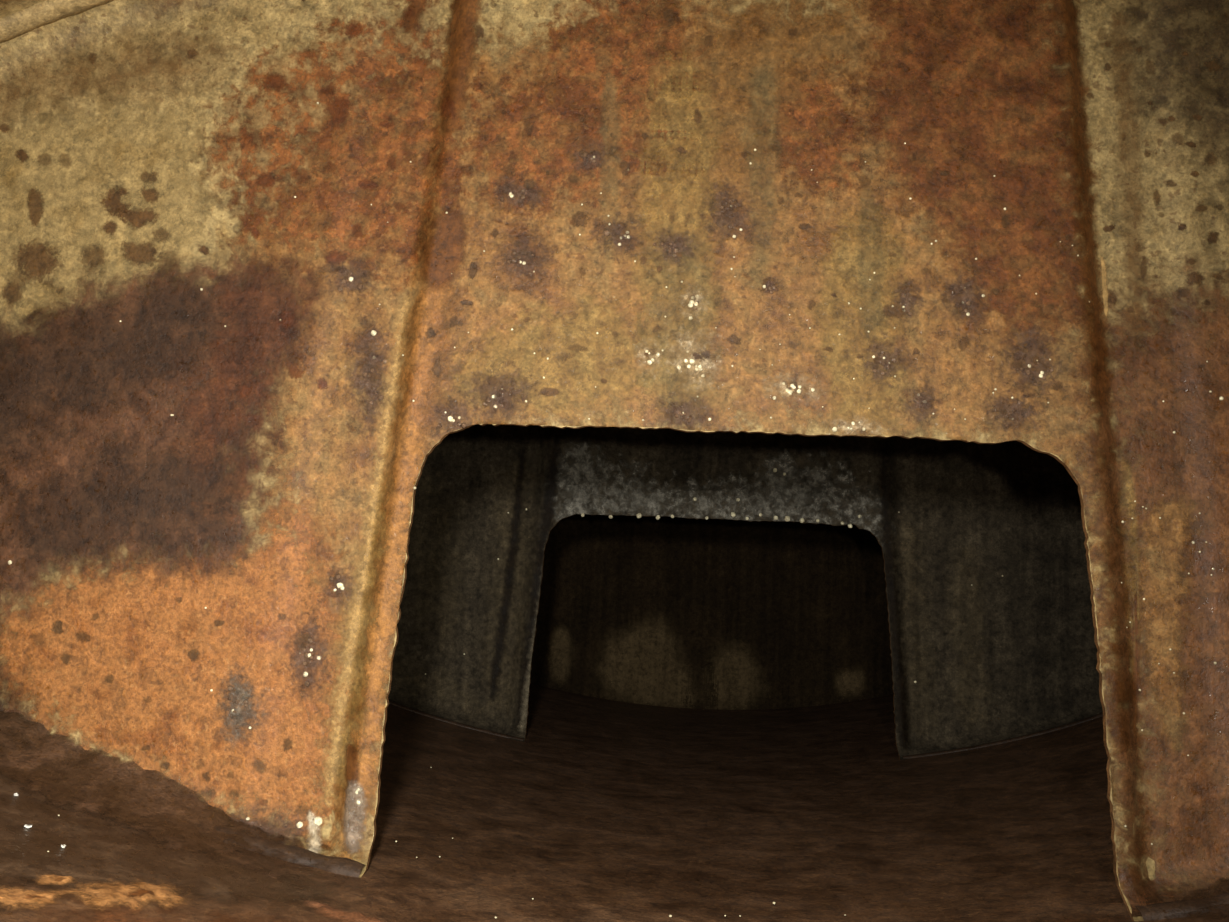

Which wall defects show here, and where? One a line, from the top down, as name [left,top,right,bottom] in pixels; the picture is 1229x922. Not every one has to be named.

corrosion [1103,273,1229,917]
corrosion [221,676,257,738]
corrosion [237,817,304,844]